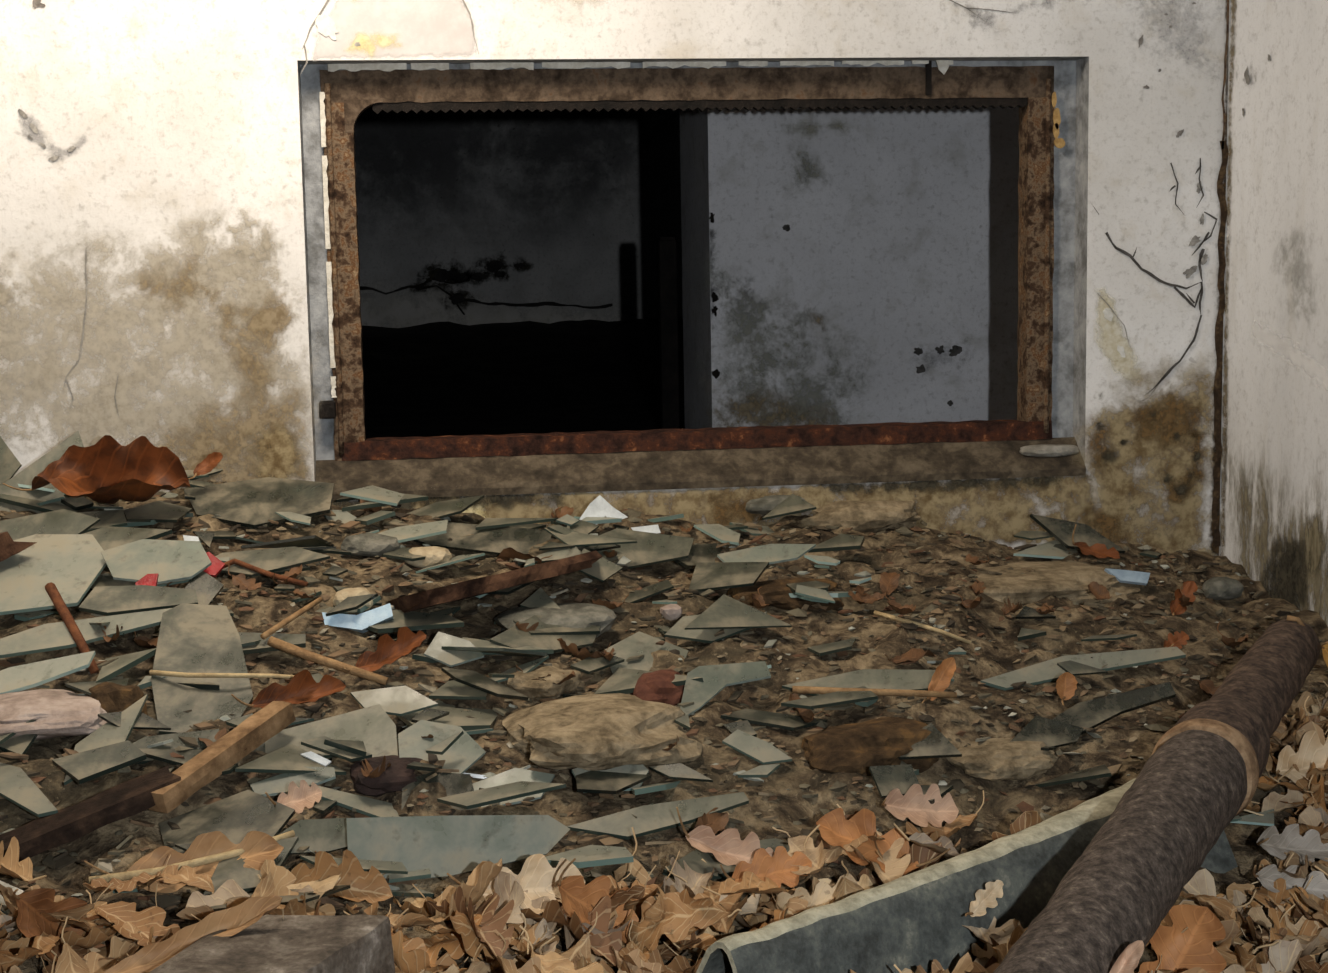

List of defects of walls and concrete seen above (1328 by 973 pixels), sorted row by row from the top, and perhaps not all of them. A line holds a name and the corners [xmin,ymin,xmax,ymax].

peeling [314,0,953,74]
water stain [0,218,310,479]
rust [387,0,1237,556]
crack [1091,158,1217,403]
water stain [1234,472,1328,625]